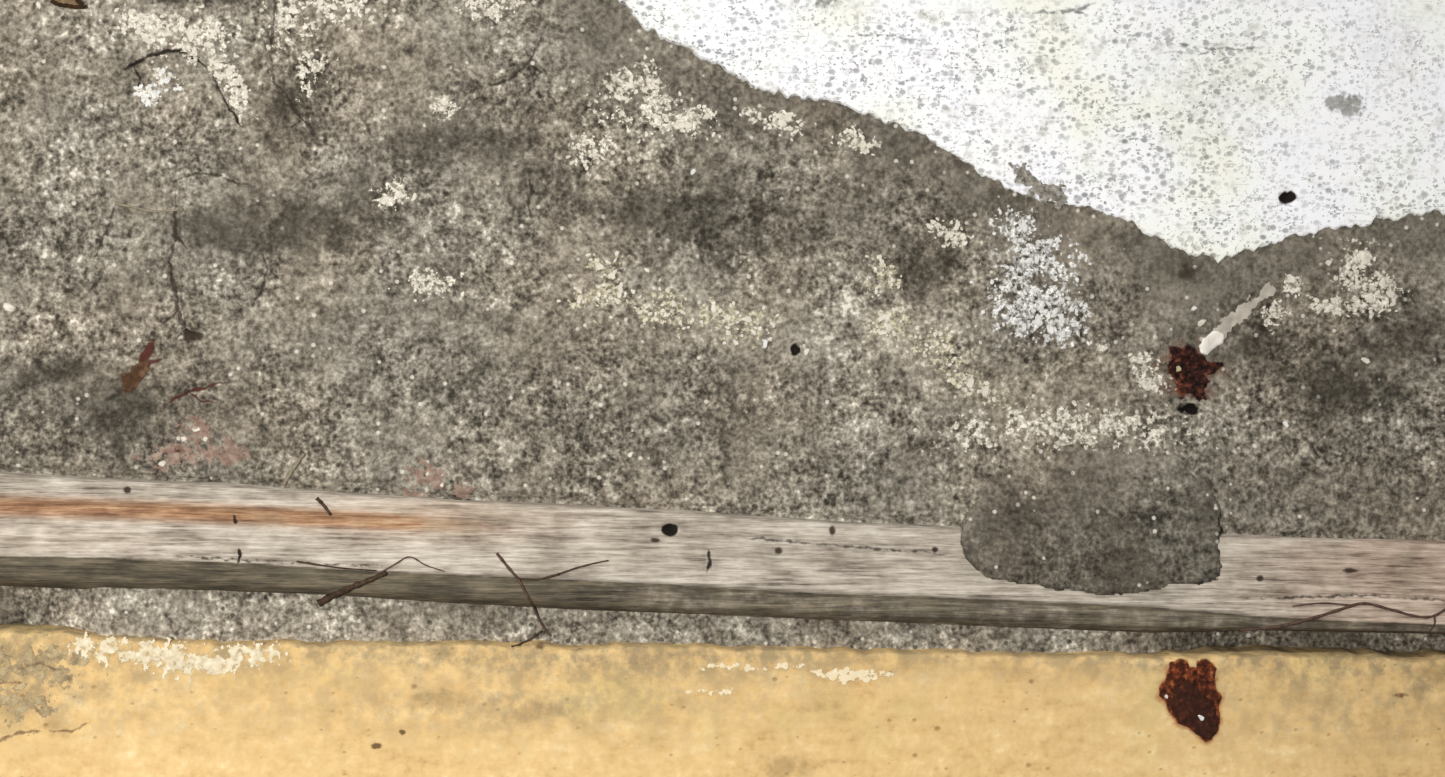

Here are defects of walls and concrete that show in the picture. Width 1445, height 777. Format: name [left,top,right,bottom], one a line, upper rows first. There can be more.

spalling [0,0,1445,540]
corrosion [1167,345,1223,401]
spalling [0,586,1445,737]
corrosion [1158,659,1222,742]